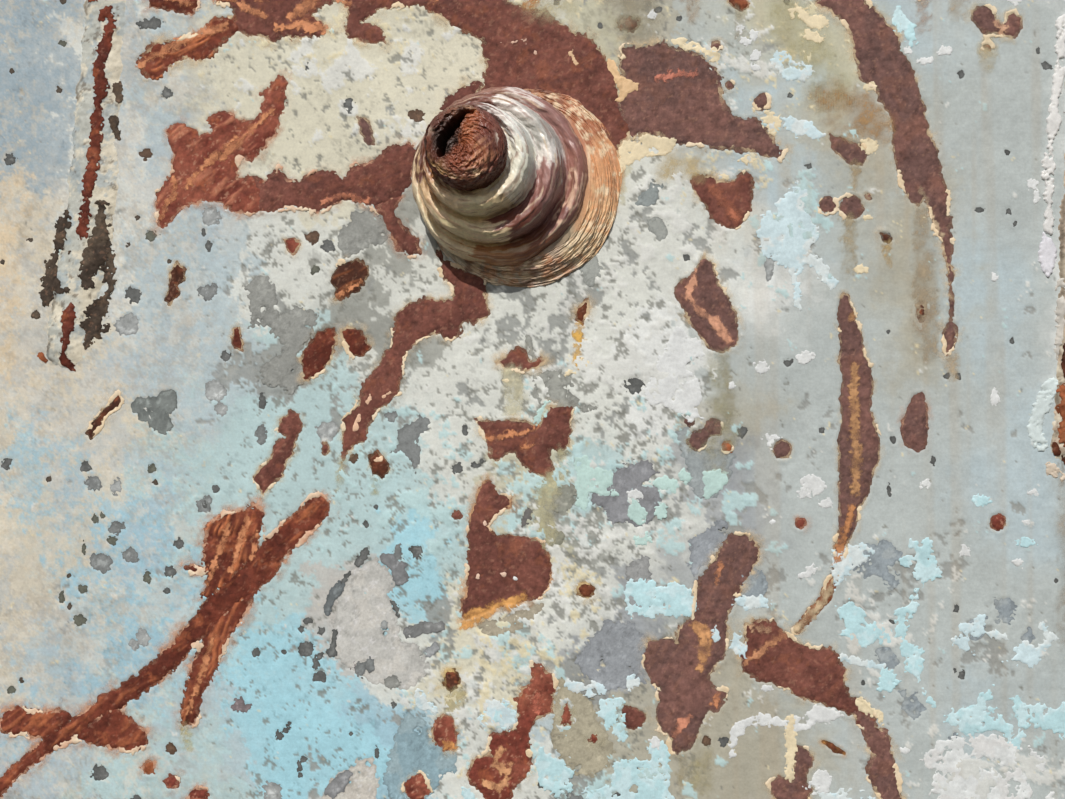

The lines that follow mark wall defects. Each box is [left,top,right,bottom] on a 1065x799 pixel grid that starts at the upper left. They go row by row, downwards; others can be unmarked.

rust [31,0,124,371]
rust [135,0,789,230]
rust [815,0,958,374]
peeling [82,512,151,584]
peeling [131,389,177,435]
rust [0,409,331,799]
peeling [281,543,457,799]
peeling [384,411,431,474]
rust [451,346,574,629]
rust [621,292,906,799]
peeling [702,703,876,799]
peeling [798,537,1065,799]